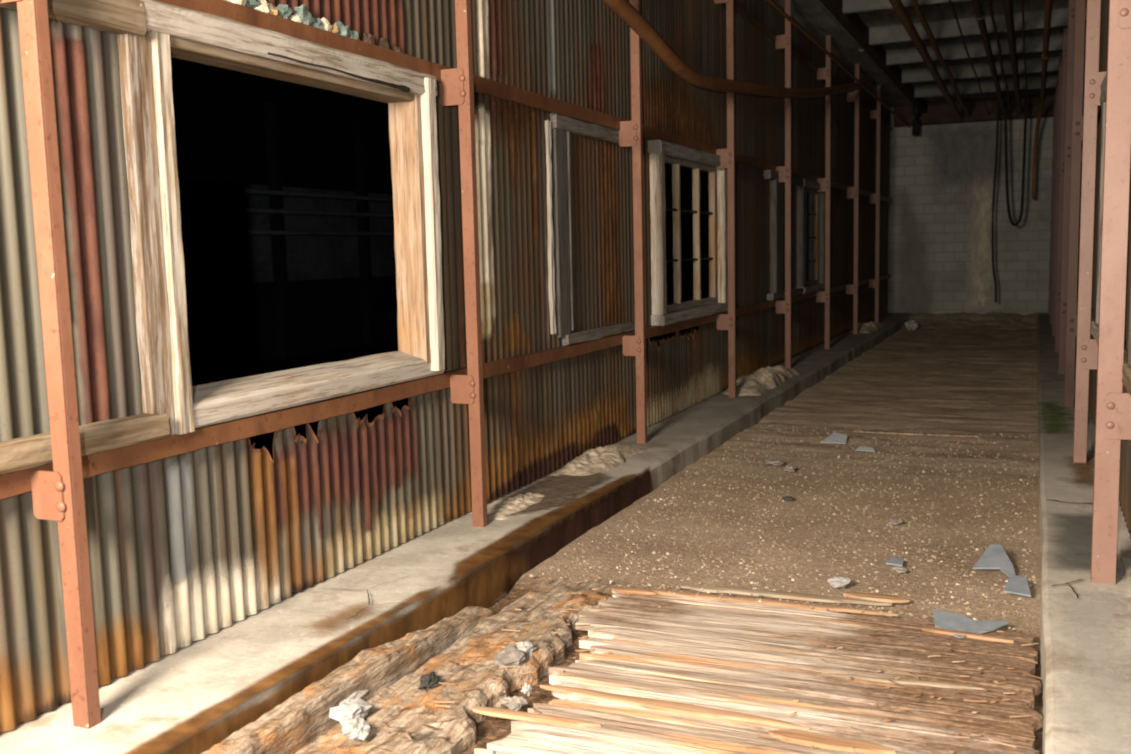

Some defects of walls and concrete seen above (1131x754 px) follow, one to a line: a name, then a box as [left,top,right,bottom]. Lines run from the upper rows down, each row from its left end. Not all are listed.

corrosion [266,0,405,50]
corrosion [249,406,418,590]
corrosion [486,370,626,503]
corrosion [0,670,17,733]
corrosion [96,630,173,686]
corrosion [125,469,653,754]